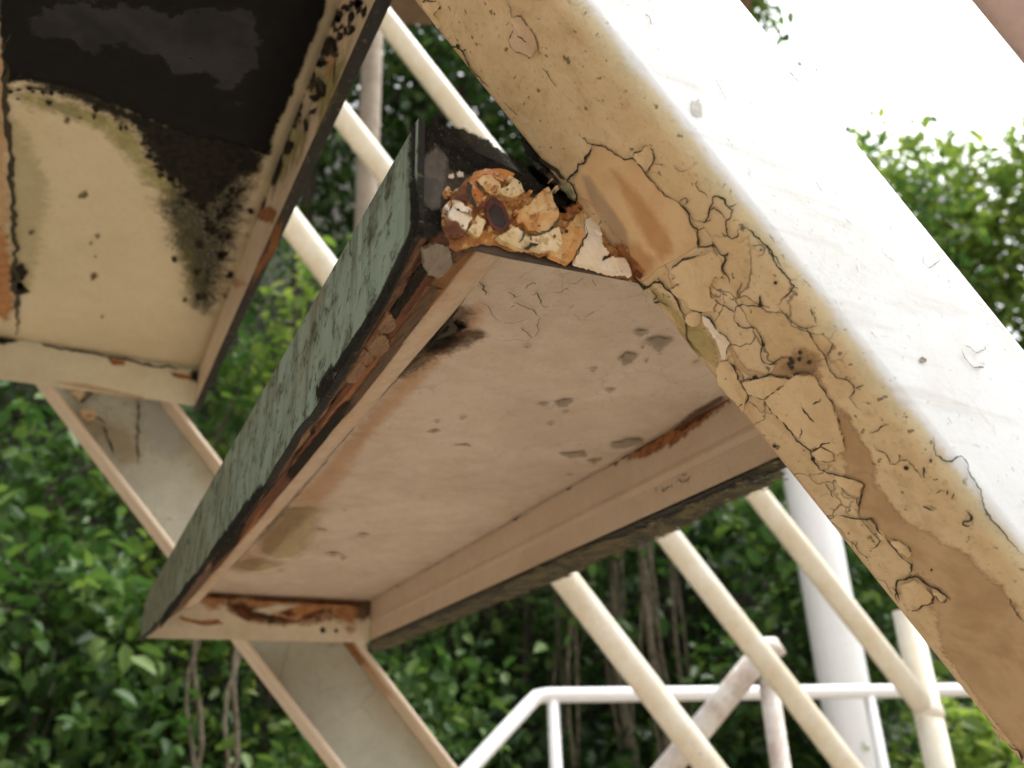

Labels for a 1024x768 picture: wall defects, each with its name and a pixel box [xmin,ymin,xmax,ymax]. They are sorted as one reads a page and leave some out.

damp [0,0,366,345]
damp [315,123,576,402]
crack [538,132,863,410]
damp [161,484,262,628]
corrosion [179,593,371,666]
corrosion [208,234,465,575]
corrosion [609,398,729,466]
crack [796,439,913,593]
crack [872,424,1022,554]